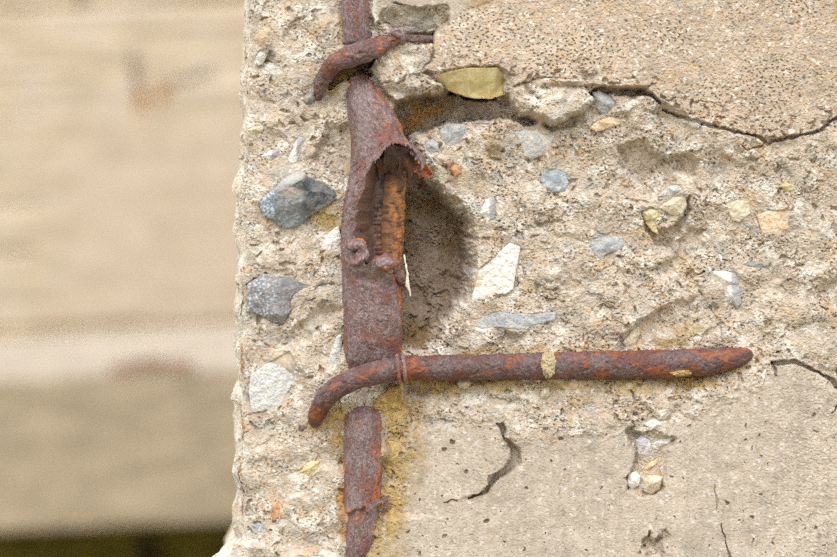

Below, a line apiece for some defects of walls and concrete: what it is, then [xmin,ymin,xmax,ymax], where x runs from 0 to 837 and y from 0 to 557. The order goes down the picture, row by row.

rust [327,67,357,93]
crack [588,86,837,152]
rust [313,139,433,277]
spalling [219,0,837,557]
rust [409,380,461,396]
rust [664,376,717,389]
crack [770,358,837,414]
rust [365,398,418,557]
crack [443,421,524,504]
rust [336,484,346,538]